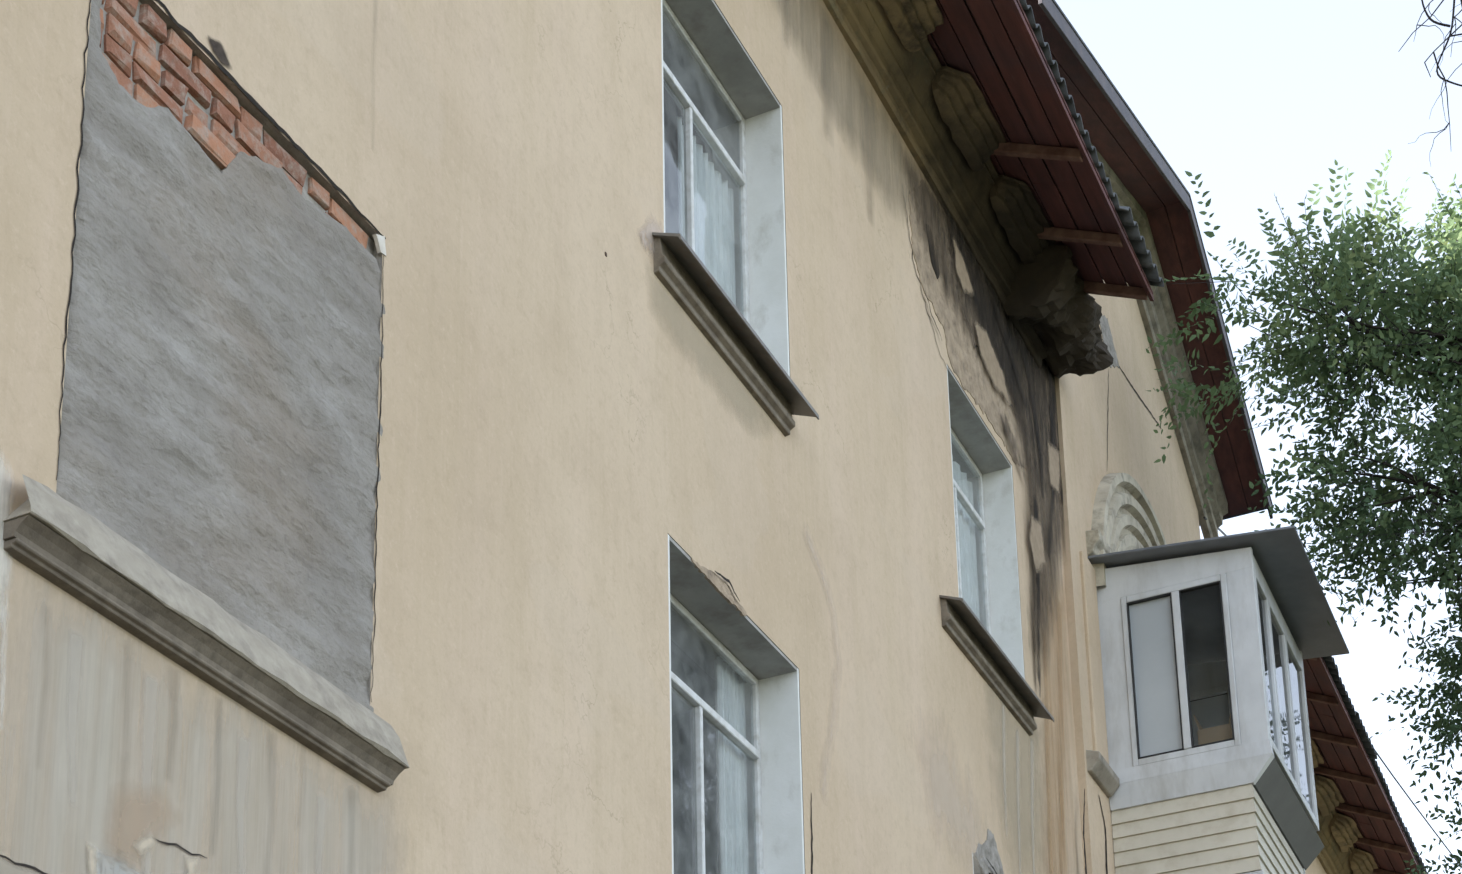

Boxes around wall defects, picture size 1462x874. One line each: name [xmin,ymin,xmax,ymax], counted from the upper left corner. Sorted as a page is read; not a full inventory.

flaking render [100,0,386,256]
leakage [0,462,9,623]
leakage [911,167,1064,694]